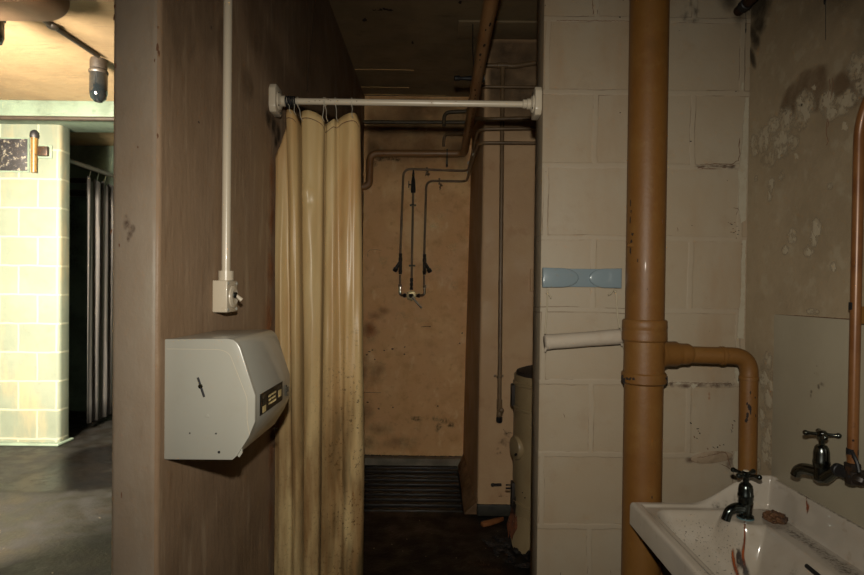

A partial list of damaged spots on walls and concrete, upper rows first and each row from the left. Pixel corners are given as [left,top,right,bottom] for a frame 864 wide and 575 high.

peeling [750,51,864,167]